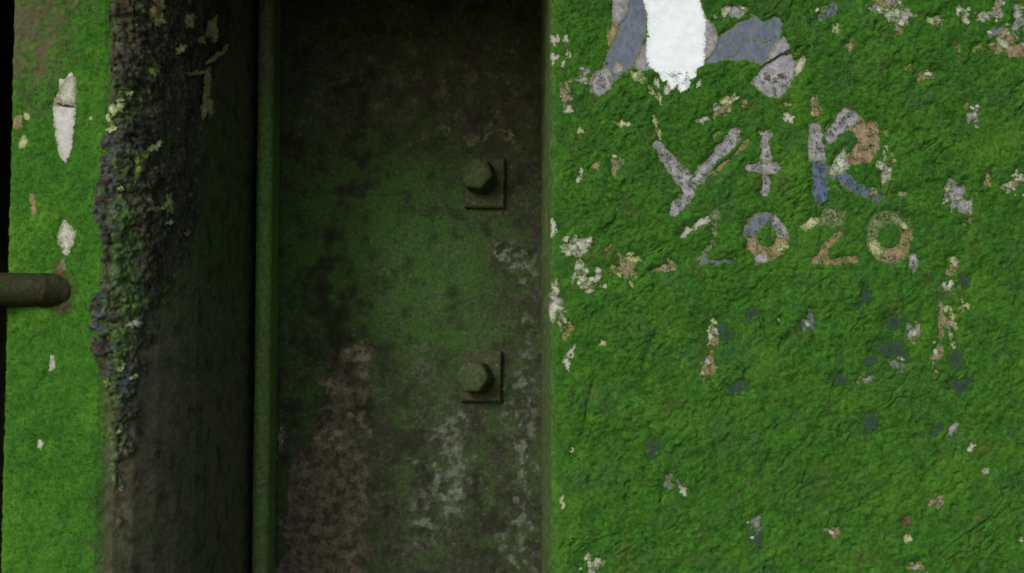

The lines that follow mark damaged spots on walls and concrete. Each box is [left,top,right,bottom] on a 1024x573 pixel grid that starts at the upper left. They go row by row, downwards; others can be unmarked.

peeling [559,0,806,114]
peeling [53,72,78,164]
flaking render [694,96,748,126]
flaking render [810,96,822,117]
peeling [866,149,897,200]
peeling [56,220,76,274]
flaking render [652,259,677,273]
peeling [548,218,637,373]